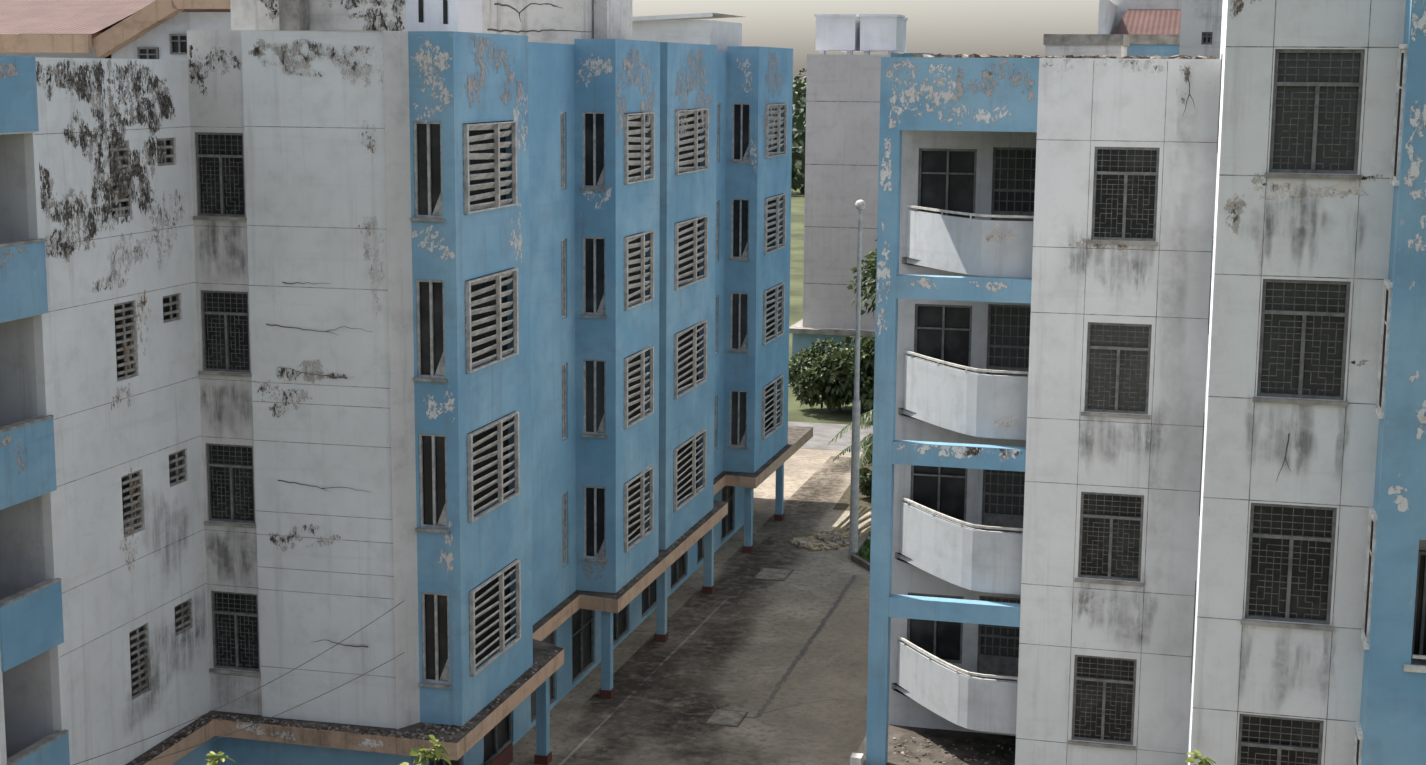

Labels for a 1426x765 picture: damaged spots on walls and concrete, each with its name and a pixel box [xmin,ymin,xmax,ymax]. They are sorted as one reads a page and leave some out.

mould [188,0,405,95]
peeling [411,35,528,152]
peeling [880,58,1035,192]
peeling [1411,0,1426,43]
mould [36,59,183,291]
damp [1225,200,1244,233]
peeling [877,222,891,336]
crack [288,368,347,380]
crack [266,323,373,335]